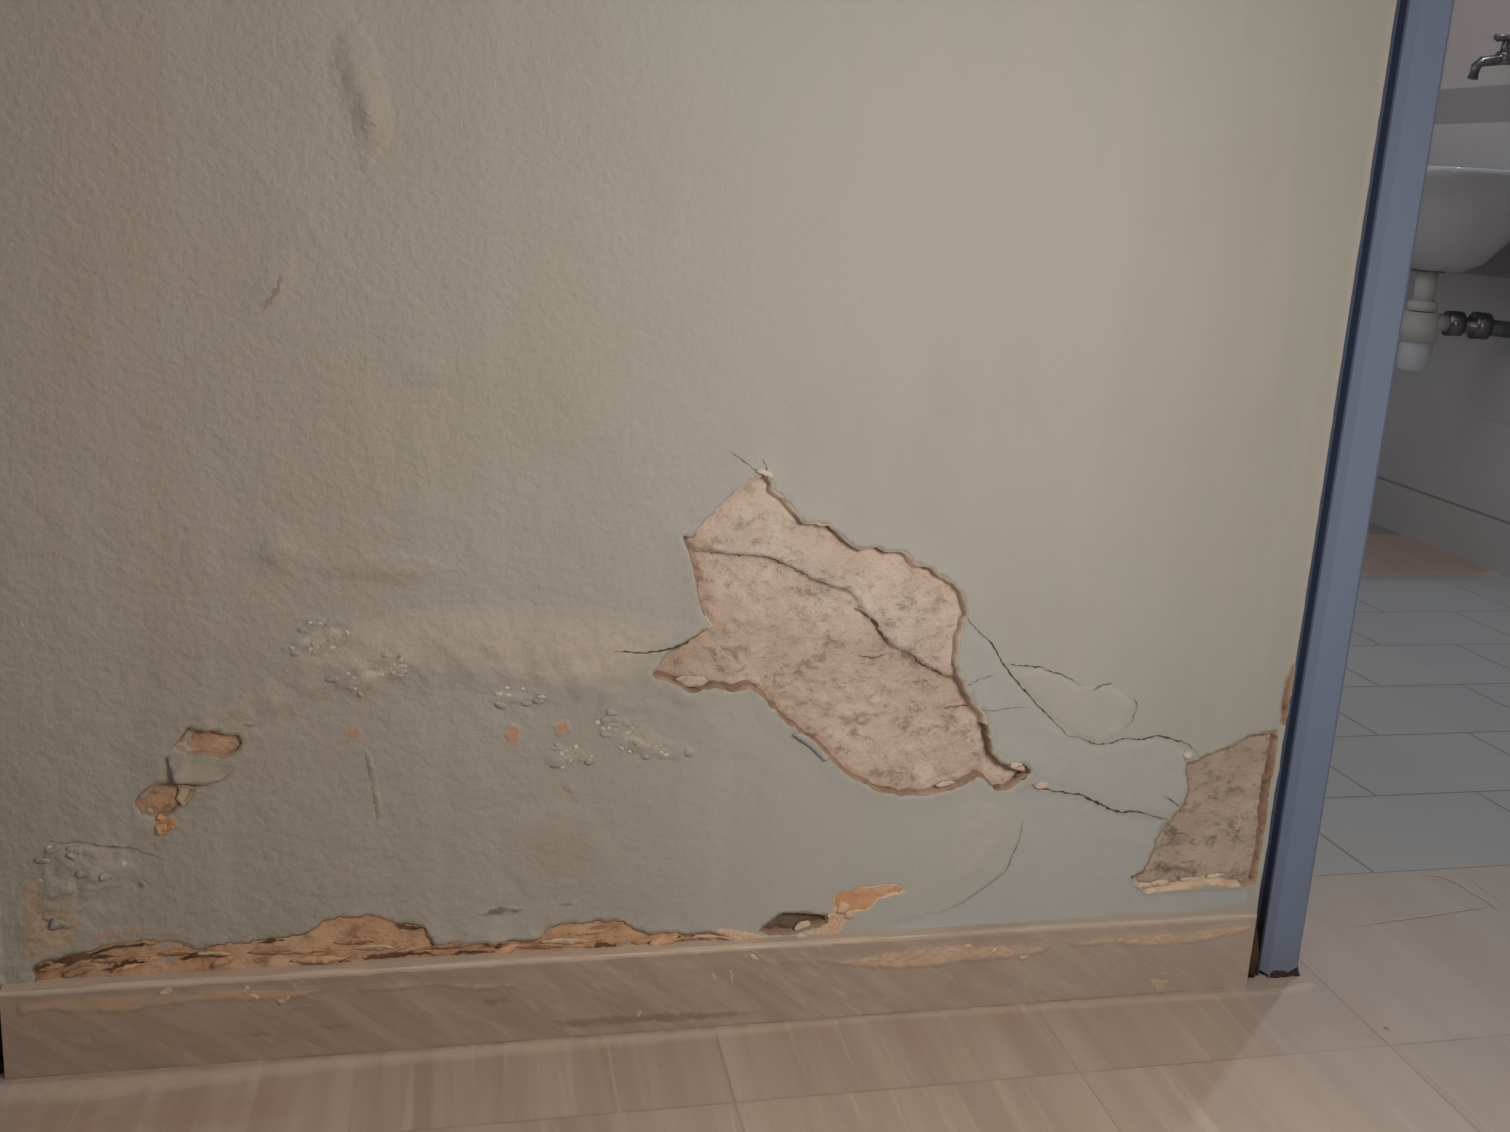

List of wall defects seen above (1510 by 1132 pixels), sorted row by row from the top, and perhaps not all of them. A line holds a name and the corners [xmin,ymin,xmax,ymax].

damp [290,603,681,697]
flaking render [652,468,1296,927]
crack [968,619,1198,760]
peeling [135,727,244,836]
crack [1032,782,1179,821]
peeling [32,884,909,1005]